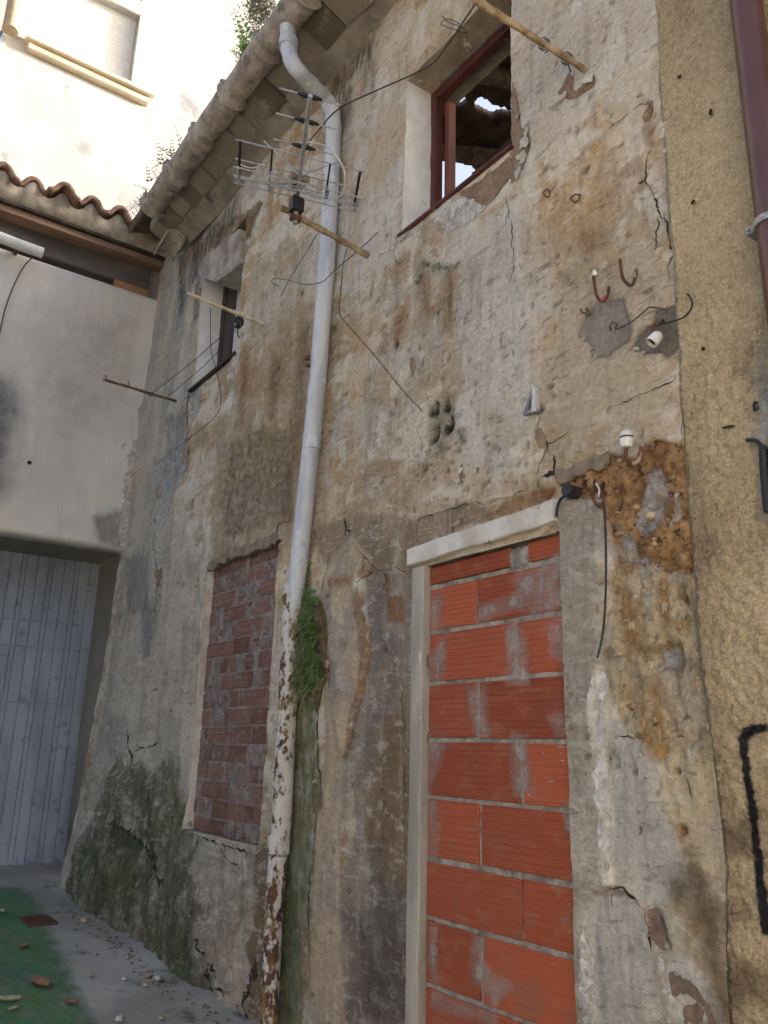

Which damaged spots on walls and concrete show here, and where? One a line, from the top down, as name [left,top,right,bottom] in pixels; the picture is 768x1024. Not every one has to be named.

flaking render [555,73,595,104]
flaking render [436,83,530,233]
crack [638,153,673,279]
crack [606,377,676,412]
crack [416,417,567,521]
flaking render [554,438,704,873]
crack [115,734,159,781]
crack [107,822,165,906]
crack [606,886,652,951]
flaking render [643,907,715,1024]